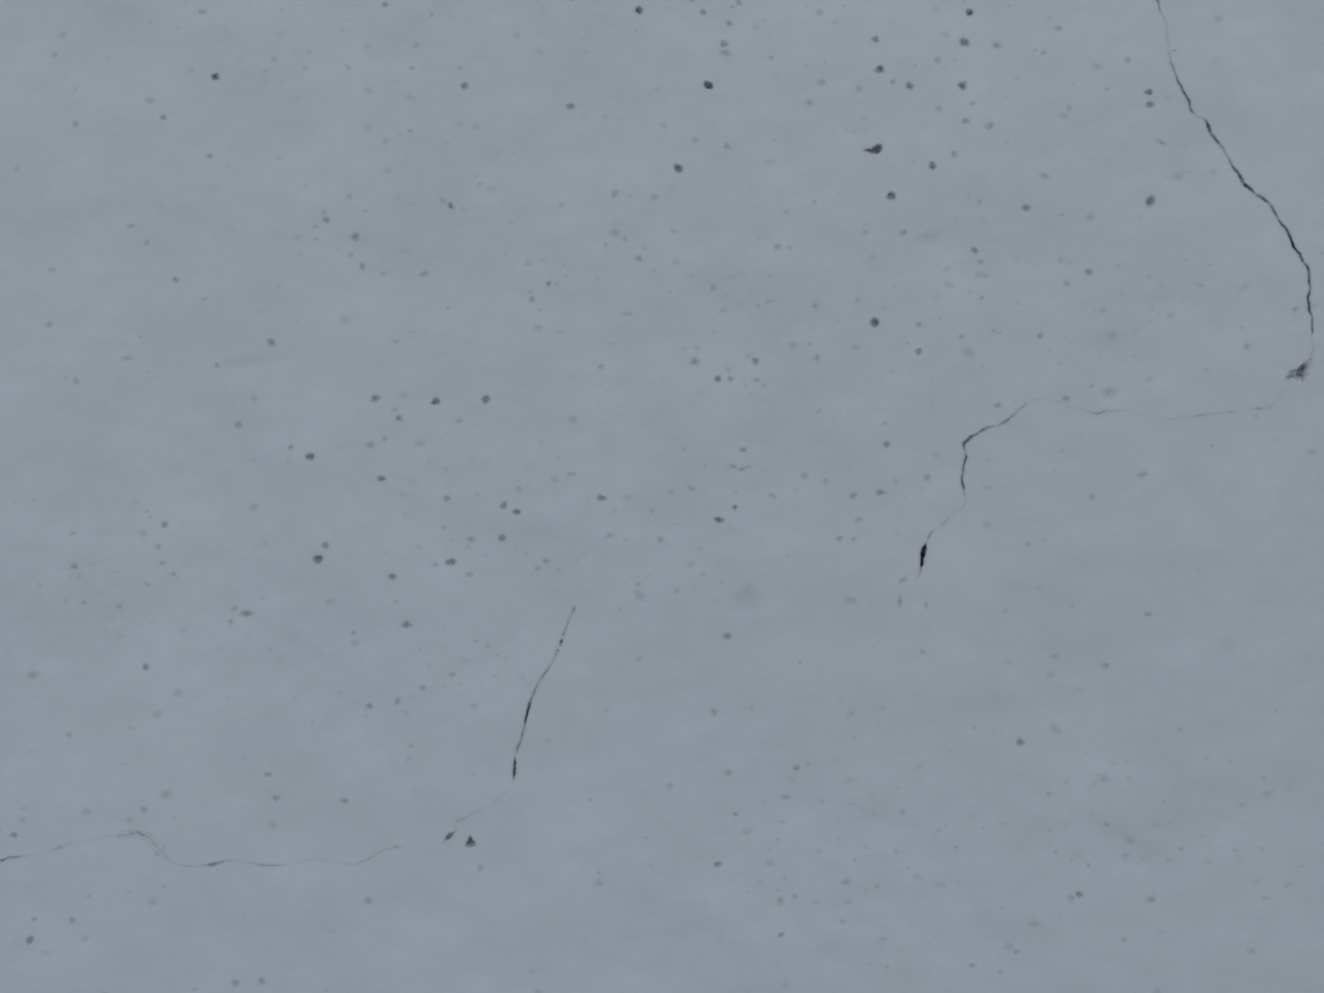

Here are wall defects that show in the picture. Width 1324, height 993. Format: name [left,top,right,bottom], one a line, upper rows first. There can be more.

crack [1154,0,1317,359]
crack [914,396,1142,582]
crack [441,606,577,844]
crack [0,829,402,869]